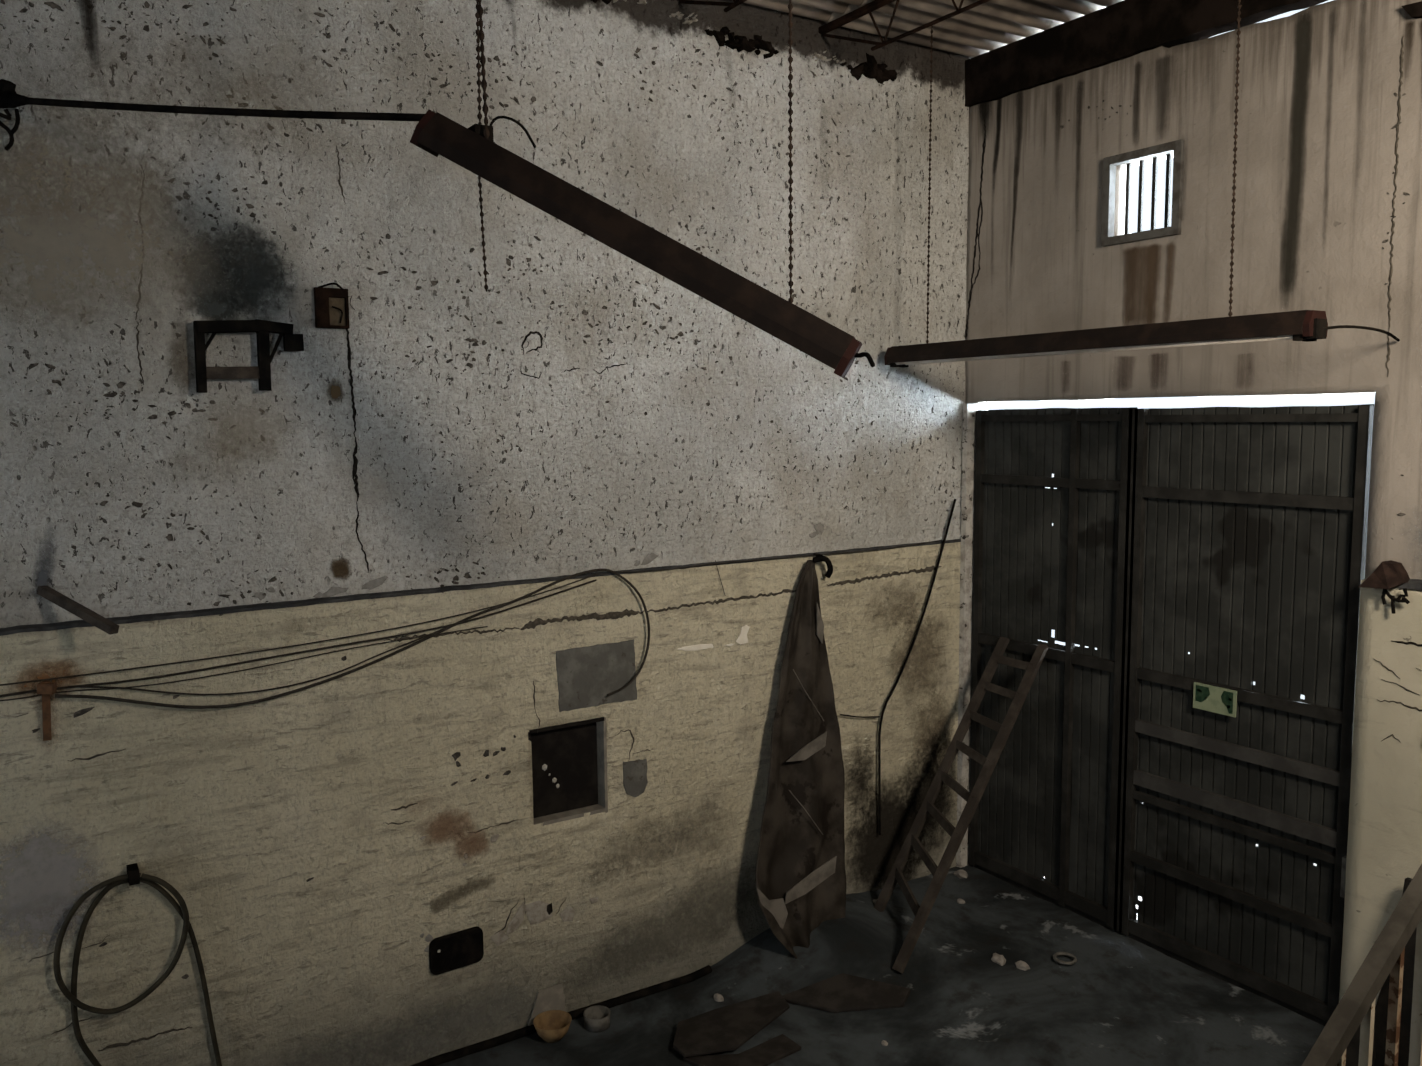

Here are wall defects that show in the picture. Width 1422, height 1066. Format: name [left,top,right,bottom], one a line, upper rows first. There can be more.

water stain [79,0,96,56]
water stain [0,120,294,320]
crack [336,145,345,202]
water stain [979,91,1023,253]
water stain [1282,14,1312,294]
crack [1386,37,1404,377]
crack [346,296,369,573]
crack [384,566,942,642]
water stain [893,631,939,691]
crack [1374,641,1422,742]
corrosion [430,813,485,855]
water stain [846,706,956,890]